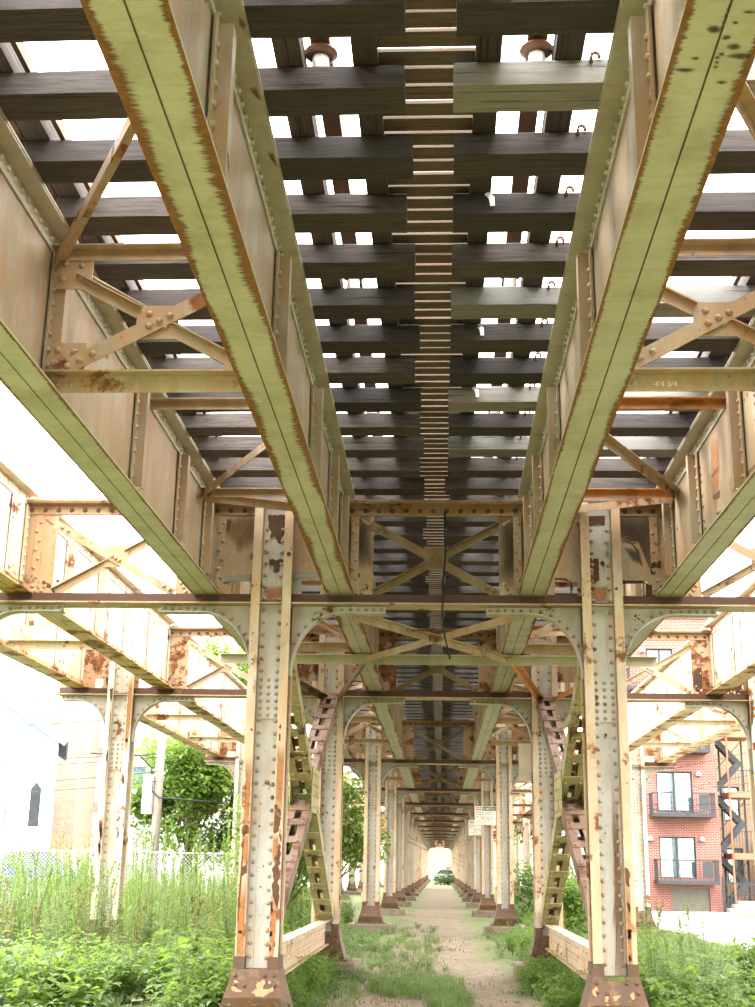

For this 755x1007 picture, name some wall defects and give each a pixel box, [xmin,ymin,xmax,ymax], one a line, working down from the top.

rust [80,0,354,593]
rust [518,0,755,595]
rust [0,321,218,592]
peeling [268,514,292,573]
peeling [589,515,605,526]
peeling [590,558,605,582]
rust [244,769,261,827]
peeling [237,821,249,933]
rust [237,895,246,956]
rust [259,907,277,956]
peeling [231,980,273,997]
peeling [592,987,635,1006]